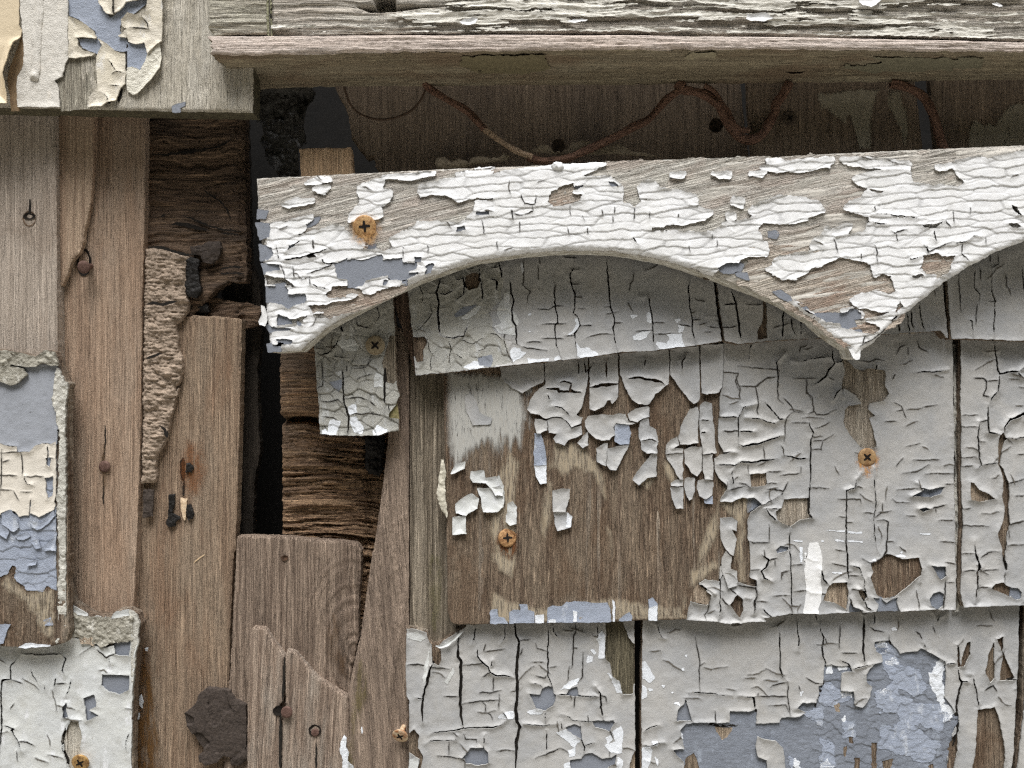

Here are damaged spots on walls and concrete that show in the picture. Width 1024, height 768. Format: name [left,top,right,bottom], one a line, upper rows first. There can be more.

peeling [58,54,97,112]
peeling [126,43,162,95]
peeling [255,169,500,275]
peeling [258,305,302,353]
crack [313,308,390,436]
peeling [308,279,408,319]
peeling [603,150,957,448]
peeling [0,368,69,649]
peeling [431,344,767,694]
crack [416,167,1024,746]
peeling [823,554,922,609]
crack [410,623,681,768]